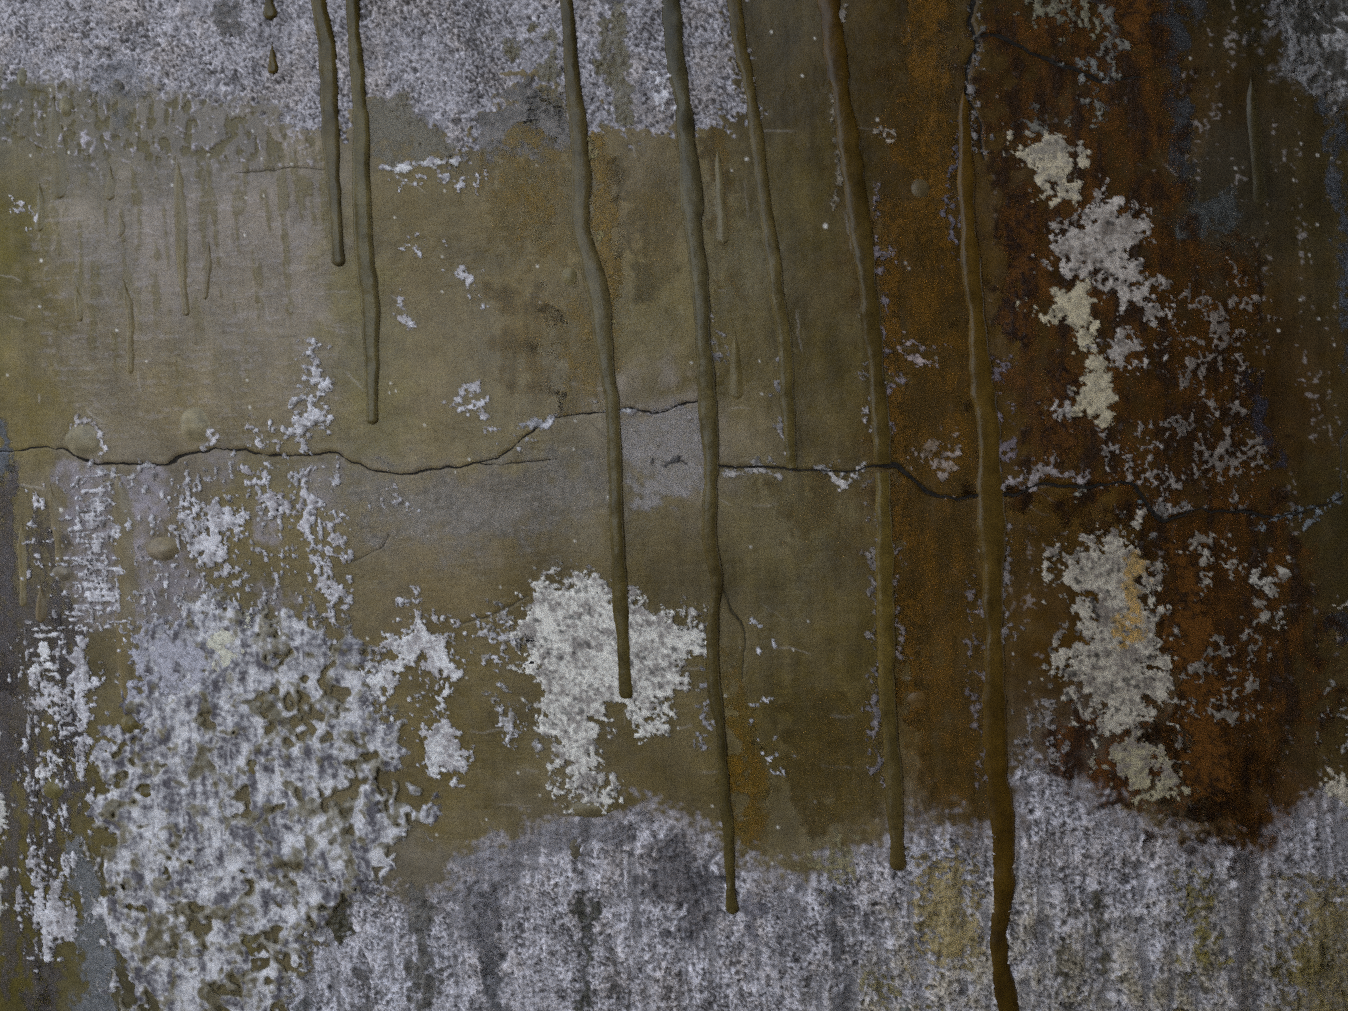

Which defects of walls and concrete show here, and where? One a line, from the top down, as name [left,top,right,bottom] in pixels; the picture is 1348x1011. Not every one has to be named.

damp [263,0,278,20]
damp [268,45,279,74]
damp [173,158,212,316]
crack [0,400,698,479]
damp [311,0,807,954]
crack [719,430,1348,538]
damp [808,0,1292,1011]
corrosion [961,0,1348,843]
peeling [0,337,354,973]
peeling [351,559,709,815]
damp [352,967,373,1011]
damp [404,816,632,1011]